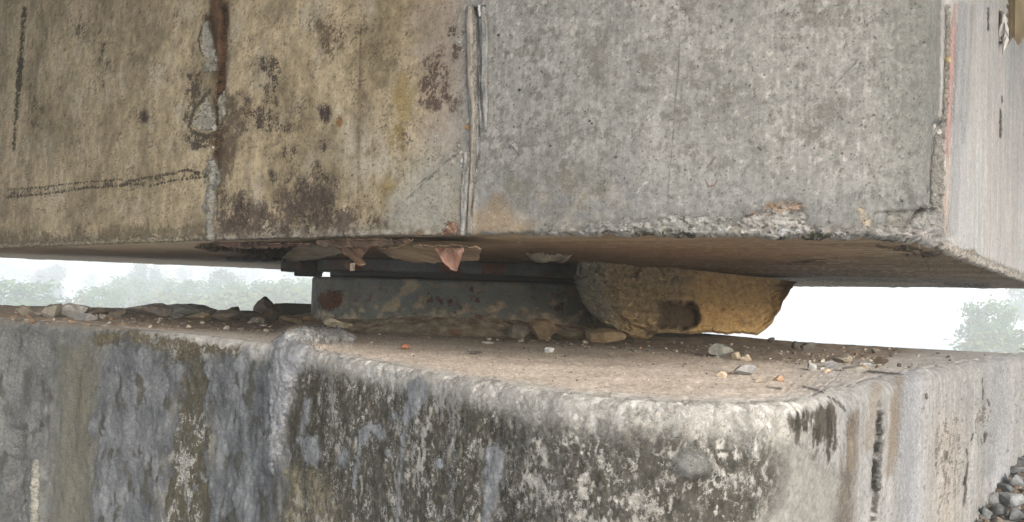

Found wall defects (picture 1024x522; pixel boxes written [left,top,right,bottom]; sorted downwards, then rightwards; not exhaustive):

leakage [0,55,387,247]
rust [204,0,229,170]
leakage [417,26,466,112]
spalling [0,4,1024,282]
leakage [47,329,240,522]
leakage [274,349,918,522]